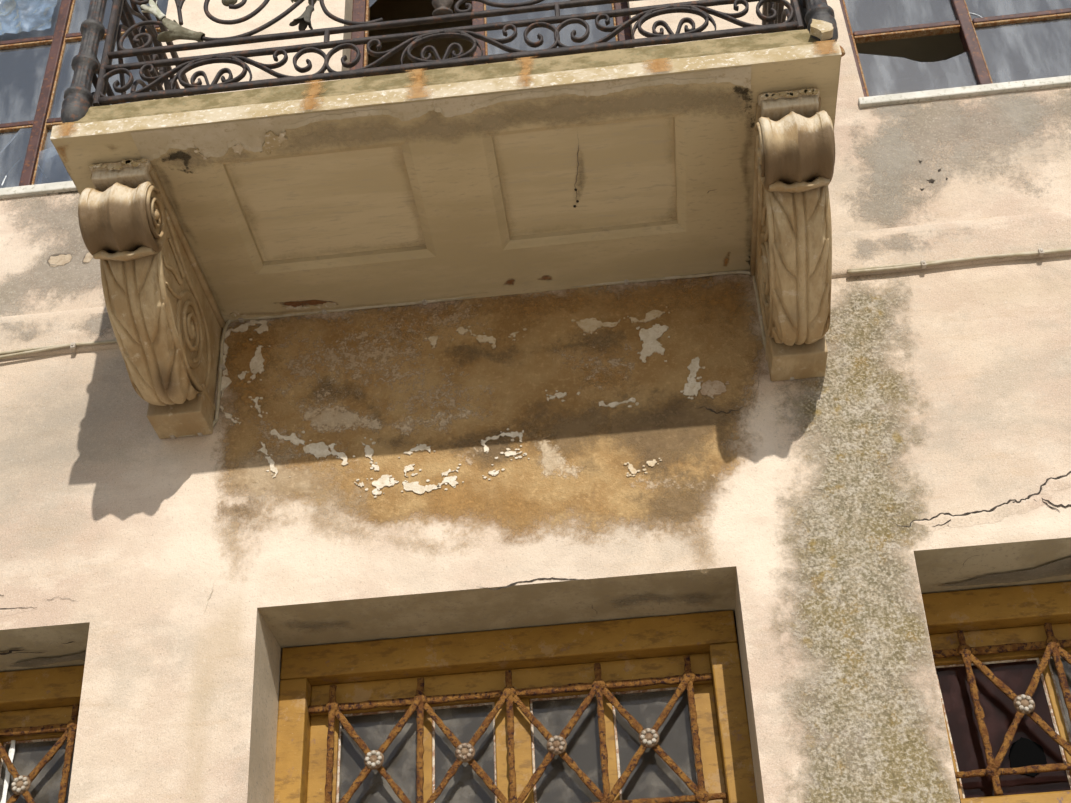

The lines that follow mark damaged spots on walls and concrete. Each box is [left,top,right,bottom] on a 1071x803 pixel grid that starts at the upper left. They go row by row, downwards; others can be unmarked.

rust [304,80,321,110]
rust [408,68,428,99]
peeling [88,66,819,170]
rust [518,57,532,86]
damp [852,92,1071,258]
damp [0,191,102,340]
damp [222,257,764,557]
peeling [257,429,464,498]
peeling [481,428,530,480]
crack [896,471,1071,532]
crack [0,595,75,617]
crack [476,577,597,612]